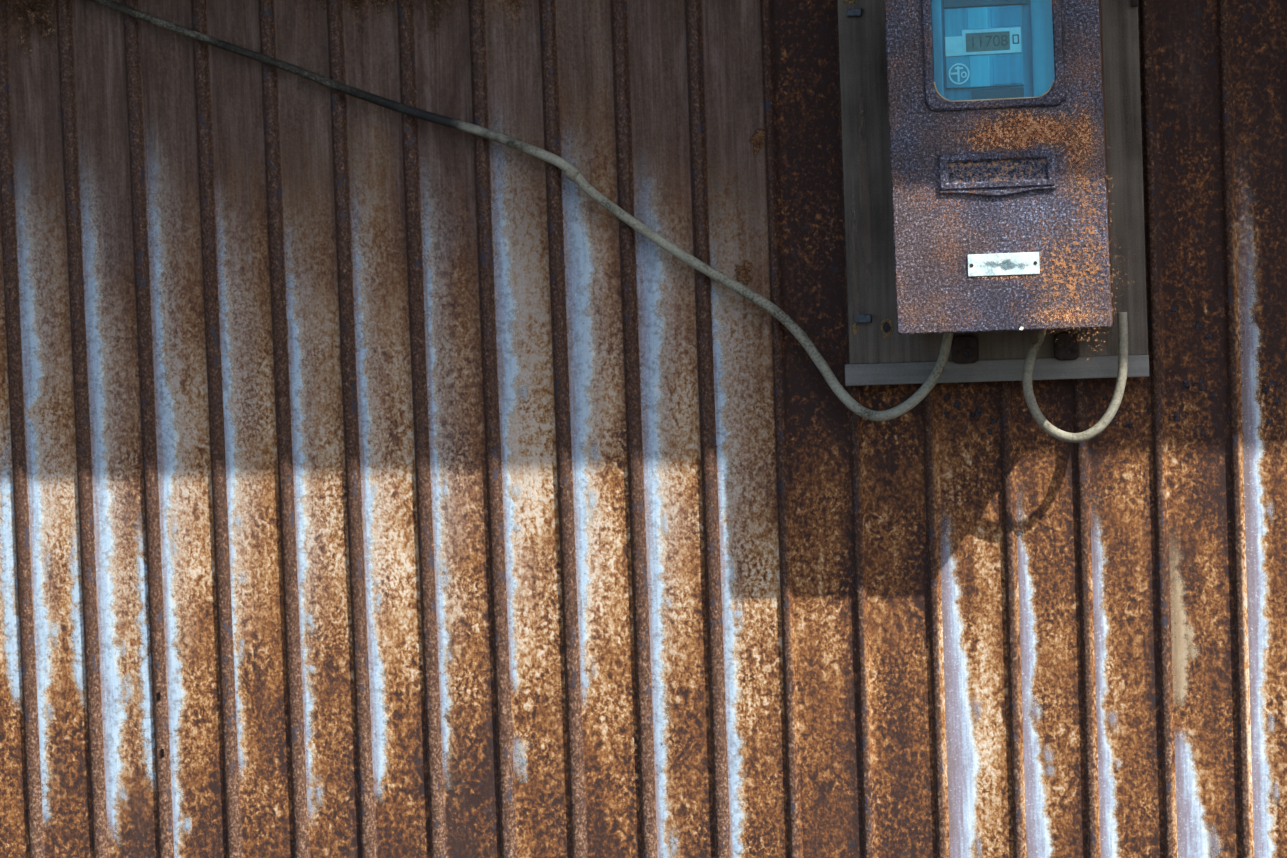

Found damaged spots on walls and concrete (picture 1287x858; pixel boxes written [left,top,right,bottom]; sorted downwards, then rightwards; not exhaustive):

rust [735,261,753,285]
rust [949,41,1129,342]